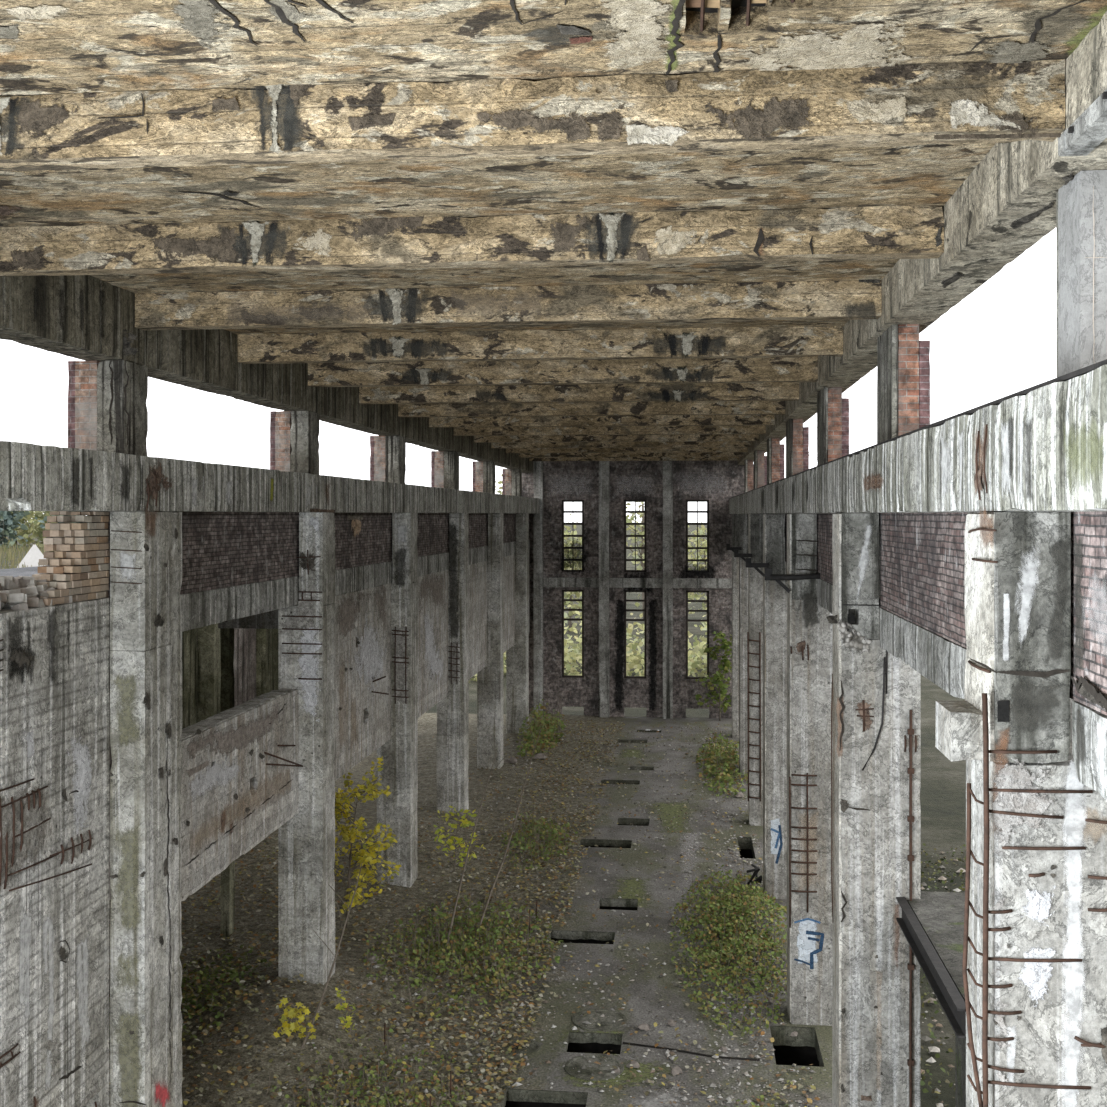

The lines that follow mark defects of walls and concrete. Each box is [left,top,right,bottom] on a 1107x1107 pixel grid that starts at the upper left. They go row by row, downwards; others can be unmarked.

crack [209,0,257,46]
crack [264,0,354,42]
flaking render [510,0,673,69]
crack [665,0,686,75]
flaking render [686,0,767,32]
flaking render [713,13,924,72]
flaking render [971,0,1086,63]
damp [0,97,29,156]
damp [252,84,301,154]
rust [974,424,988,500]